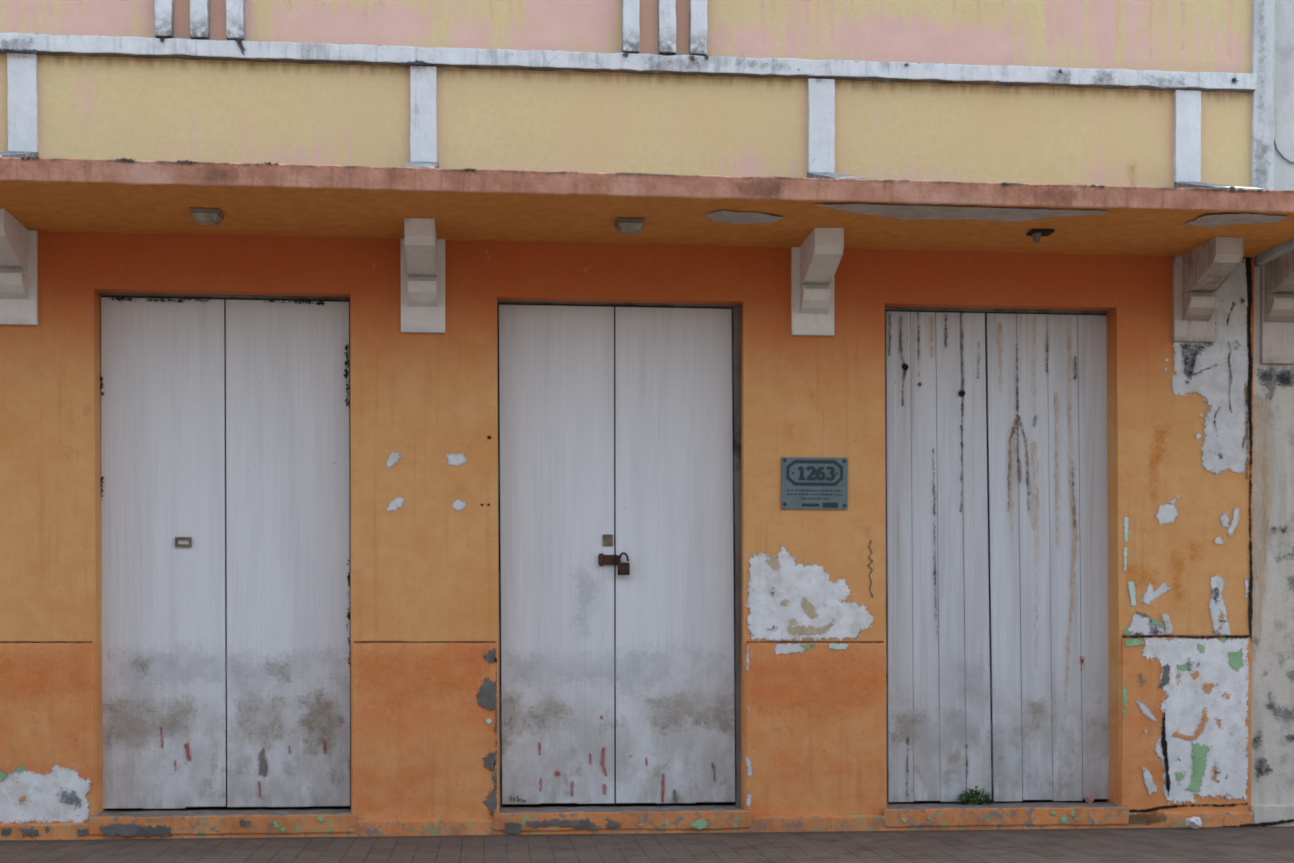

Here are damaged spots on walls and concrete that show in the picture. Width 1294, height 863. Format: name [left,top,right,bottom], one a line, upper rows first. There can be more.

peeling [1164,259,1249,476]
peeling [446,453,467,466]
peeling [387,497,405,514]
peeling [1156,494,1181,525]
peeling [1215,507,1240,545]
damp [1252,366,1294,656]
peeling [745,544,874,671]
peeling [1122,517,1249,804]
spalling [477,648,622,835]
damp [1251,727,1273,781]
damp [1266,692,1294,741]
peeling [0,764,172,839]